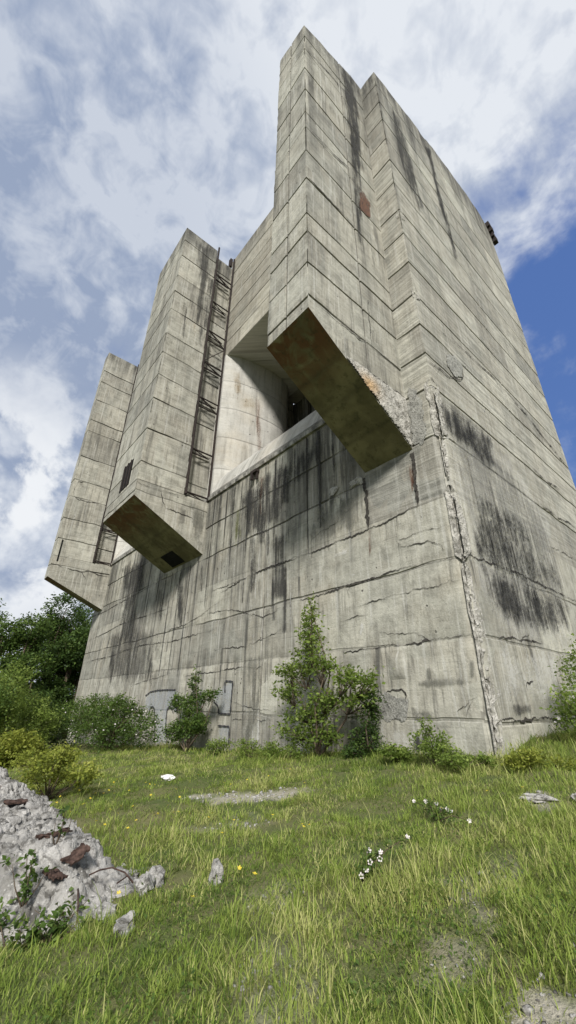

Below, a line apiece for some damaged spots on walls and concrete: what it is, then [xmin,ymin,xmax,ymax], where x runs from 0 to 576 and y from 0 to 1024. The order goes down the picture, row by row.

damp [341,68,363,240]
rust [359,192,371,217]
damp [393,110,423,208]
damp [426,148,457,256]
damp [442,406,502,471]
damp [108,431,334,675]
crack [88,492,574,686]
spalling [348,357,505,756]
damp [475,501,568,629]
crack [501,716,564,727]